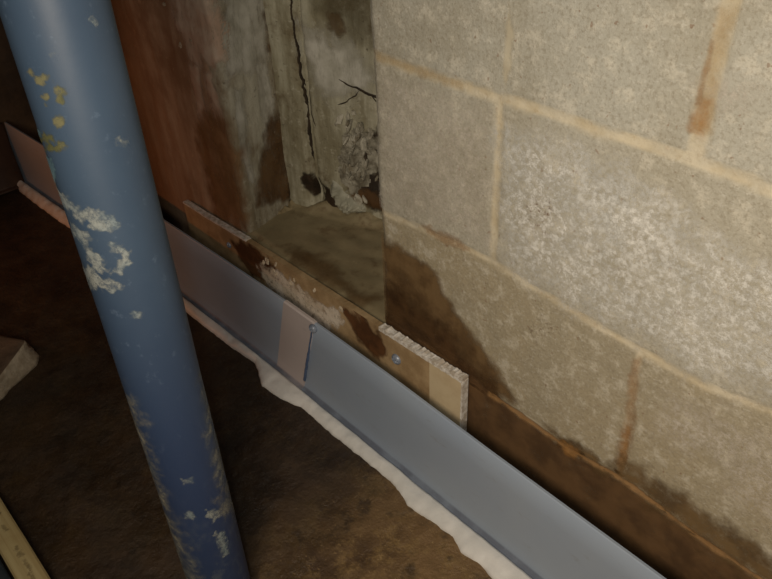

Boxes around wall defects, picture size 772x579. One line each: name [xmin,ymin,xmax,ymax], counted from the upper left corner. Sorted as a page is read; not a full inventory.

damp [222,0,290,207]
crack [290,0,316,168]
crack [338,79,376,105]
damp [343,308,386,359]
damp [381,237,772,579]
damp [500,130,772,382]